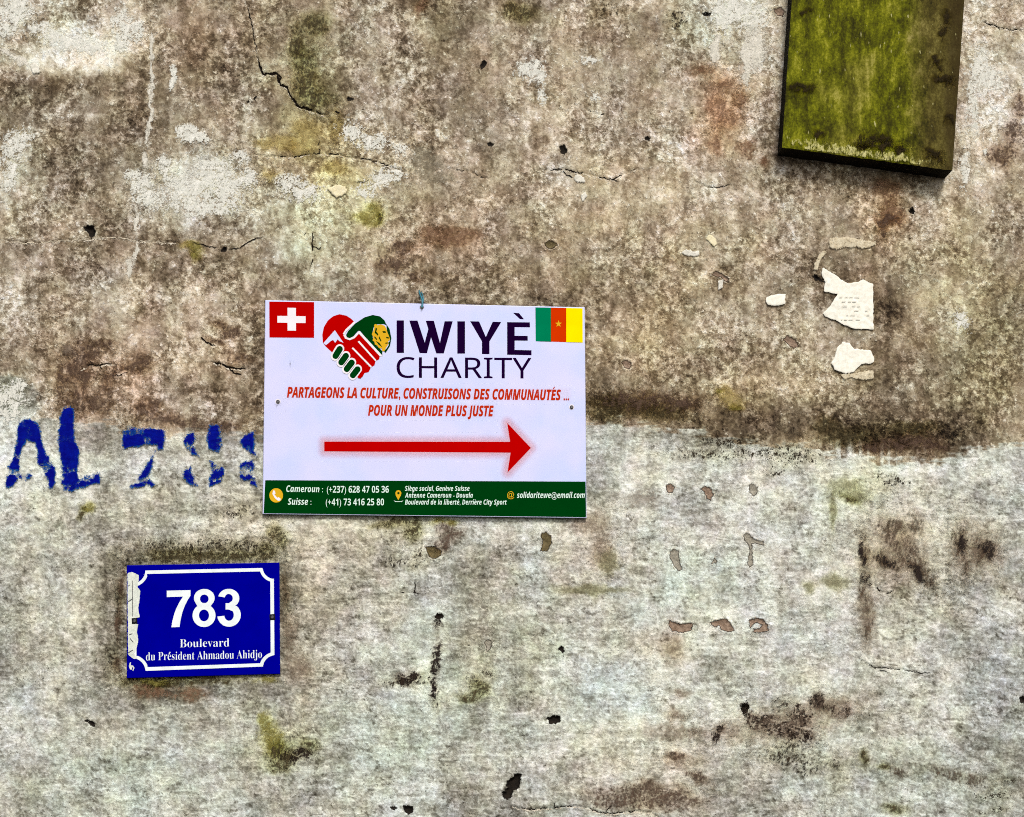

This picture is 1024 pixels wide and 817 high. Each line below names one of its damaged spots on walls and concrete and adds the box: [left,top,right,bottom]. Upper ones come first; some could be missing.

crack [244,0,339,117]
water stain [289,14,336,113]
crack [0,236,263,249]
water stain [586,390,698,421]
spalling [540,531,553,552]
spalling [742,531,764,568]
water stain [951,527,1002,572]
water stain [858,512,937,635]
spalling [667,620,694,634]
spalling [708,618,735,632]
spalling [748,616,770,633]
water stain [740,692,862,777]